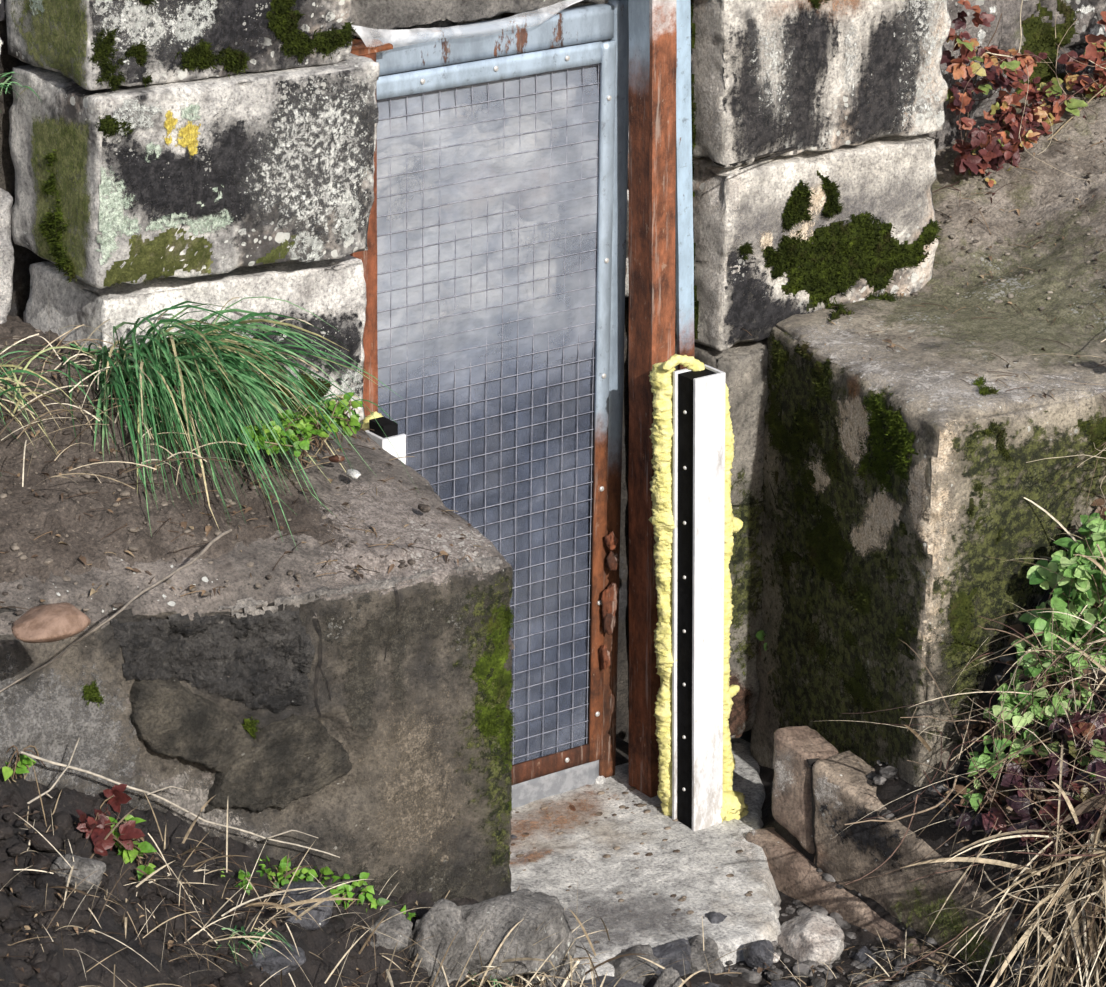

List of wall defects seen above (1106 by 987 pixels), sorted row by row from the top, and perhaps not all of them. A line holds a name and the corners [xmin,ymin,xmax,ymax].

spalling [109,462,503,714]
corrosion [599,531,619,670]
peeling [359,701,470,873]
corrosion [509,785,598,865]